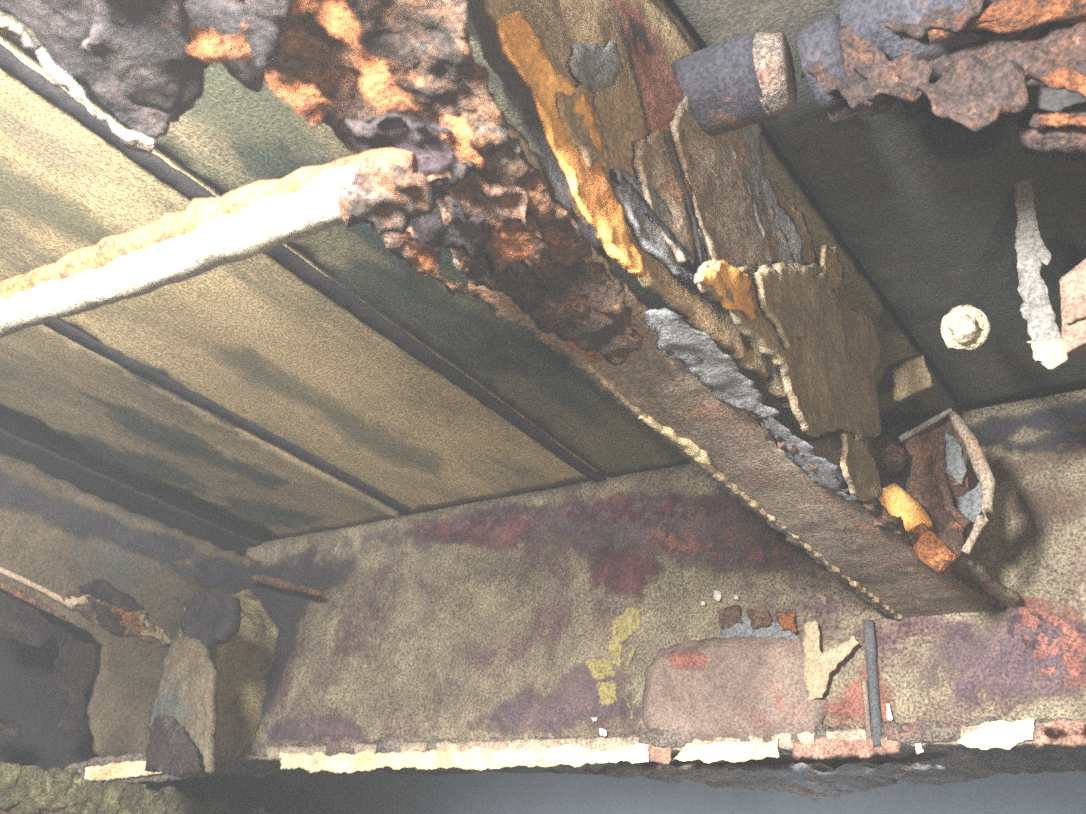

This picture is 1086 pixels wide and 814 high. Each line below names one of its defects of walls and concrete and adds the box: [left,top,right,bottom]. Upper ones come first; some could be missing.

rust [188,24,252,66]
rust [264,70,326,122]
rust [291,0,419,112]
rust [800,0,1086,134]
rust [440,115,482,167]
peeling [345,110,551,296]
rust [0,148,451,338]
rust [491,231,535,262]
spalling [495,11,883,502]
rust [61,579,172,648]
damp [700,589,739,605]
peeling [84,760,163,781]